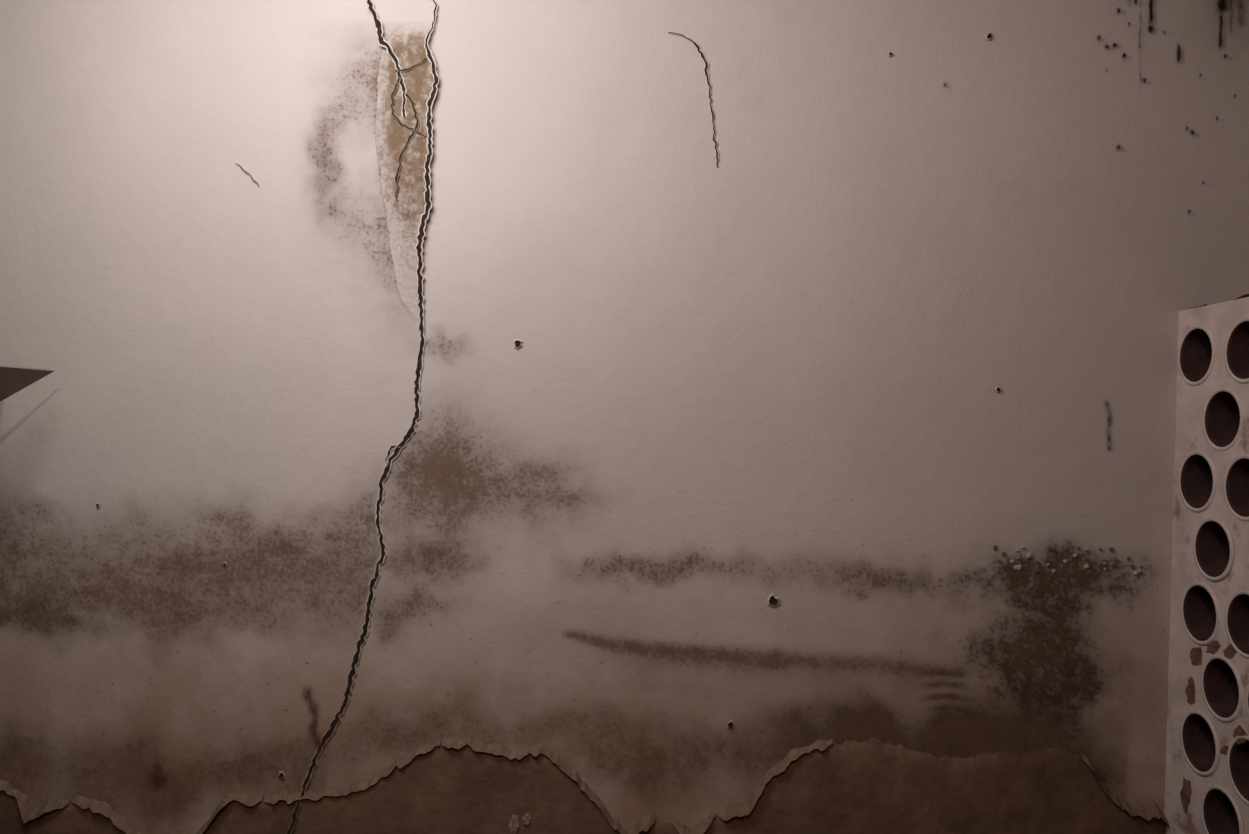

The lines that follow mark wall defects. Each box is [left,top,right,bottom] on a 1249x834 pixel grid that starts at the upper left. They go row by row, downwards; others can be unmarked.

damp [1219,0,1243,47]
damp [332,53,381,127]
crack [668,32,719,167]
crack [286,0,439,834]
damp [390,422,578,532]
damp [0,497,466,640]
damp [775,541,1151,783]
peeling [1185,640,1237,705]
flaking render [0,779,142,834]
flaking render [164,736,1169,834]
peeling [1180,777,1192,815]
peeling [1220,725,1247,755]